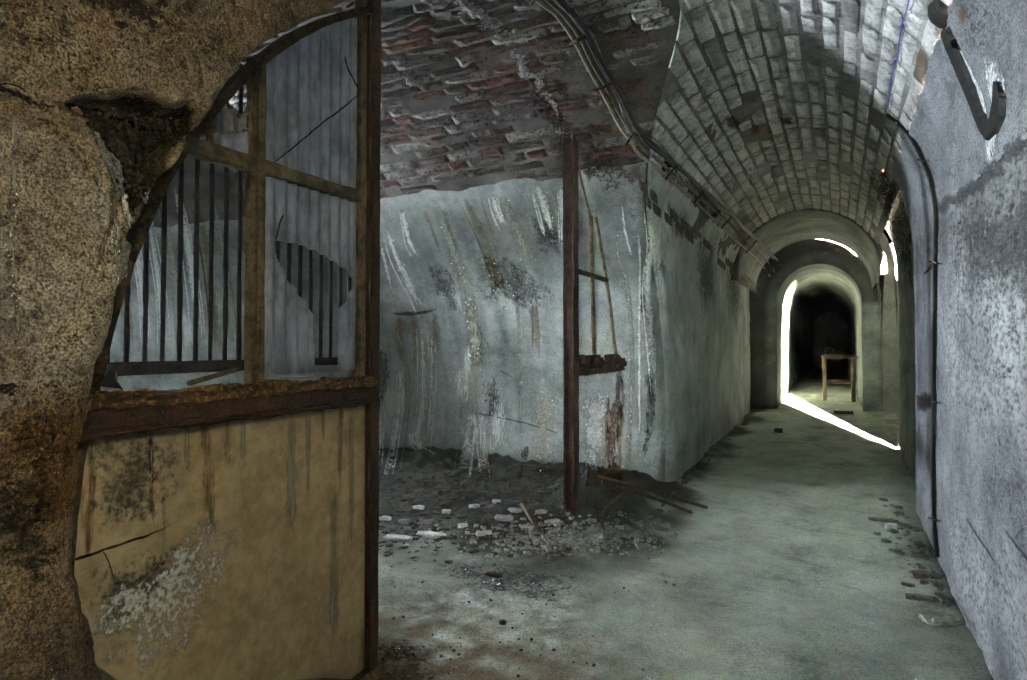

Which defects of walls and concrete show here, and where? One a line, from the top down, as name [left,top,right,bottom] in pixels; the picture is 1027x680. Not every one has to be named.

crack [0,83,51,107]
spalling [65,86,196,217]
water stain [453,0,564,119]
water stain [380,212,422,312]
water stain [462,197,551,353]
water stain [531,186,563,253]
water stain [91,428,189,521]
water stain [379,329,437,470]
water stain [461,380,506,477]
rust [603,371,624,498]
crack [75,526,167,576]
water stain [93,525,228,669]